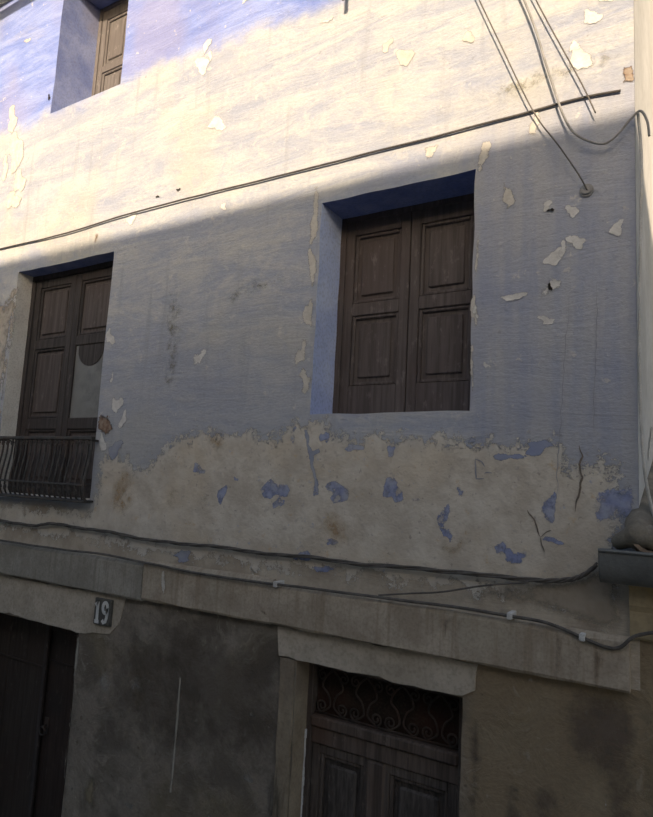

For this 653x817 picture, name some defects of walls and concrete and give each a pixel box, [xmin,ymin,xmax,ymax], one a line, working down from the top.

peeling [569,40,593,70]
spalling [623,66,634,82]
peeling [543,235,586,266]
peeling [470,295,479,325]
peeling [0,397,633,604]